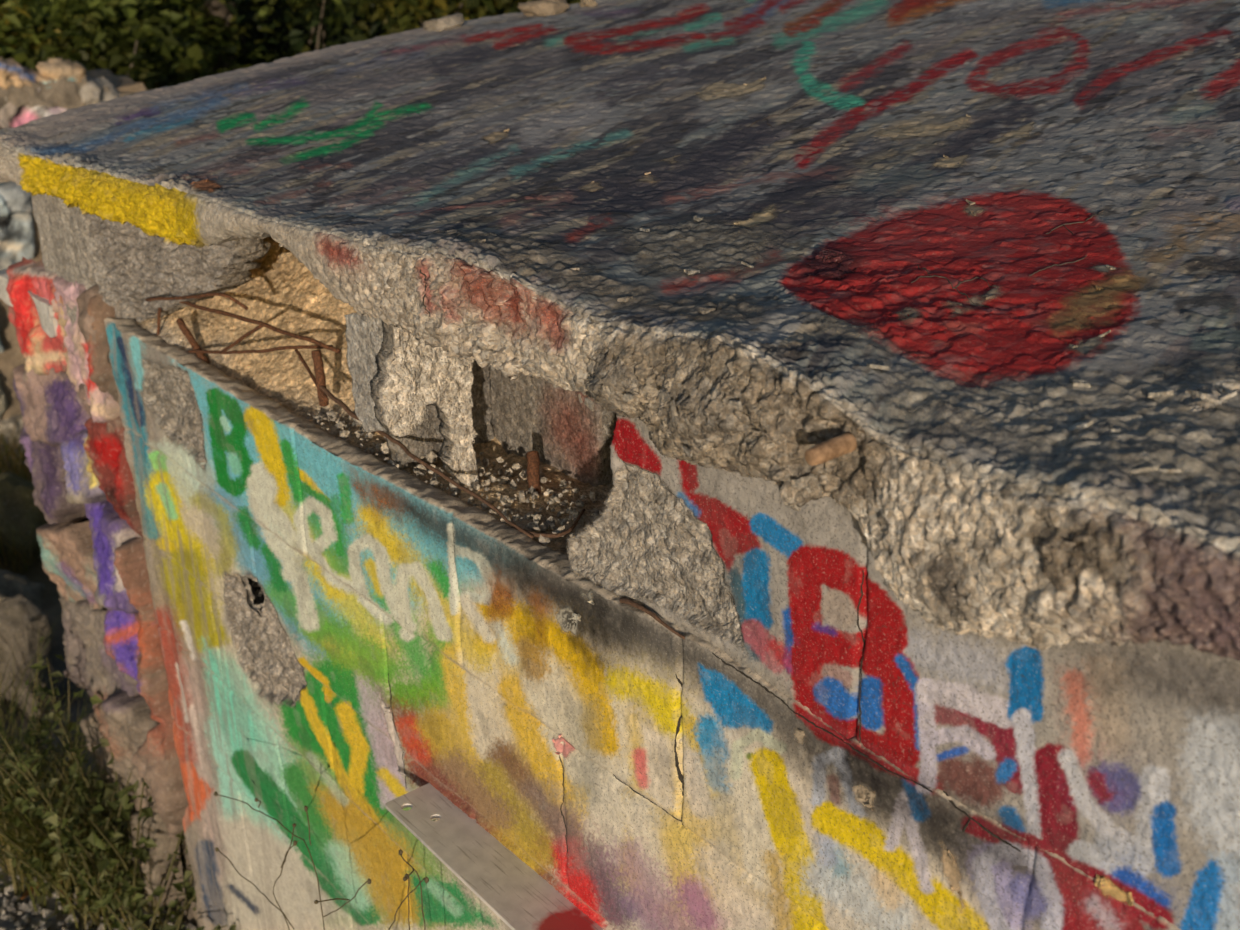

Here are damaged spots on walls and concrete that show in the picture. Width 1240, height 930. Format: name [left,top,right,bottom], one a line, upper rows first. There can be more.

spalling [432,229,764,320]
spalling [142,360,207,470]
spalling [176,318,211,365]
spalling [311,350,329,406]
spalling [224,573,307,706]
crack [613,674,684,826]
crack [712,570,1021,852]